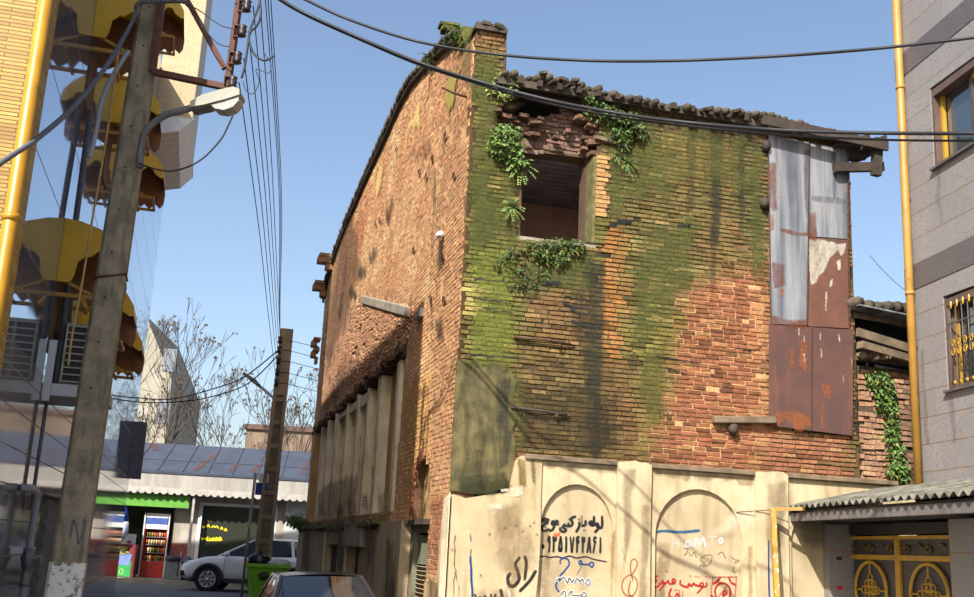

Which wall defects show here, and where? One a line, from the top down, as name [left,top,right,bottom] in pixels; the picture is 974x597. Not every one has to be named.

spalling [485,88,606,158]
rust [772,213,817,239]
peeling [809,239,846,284]
water stain [459,381,535,494]